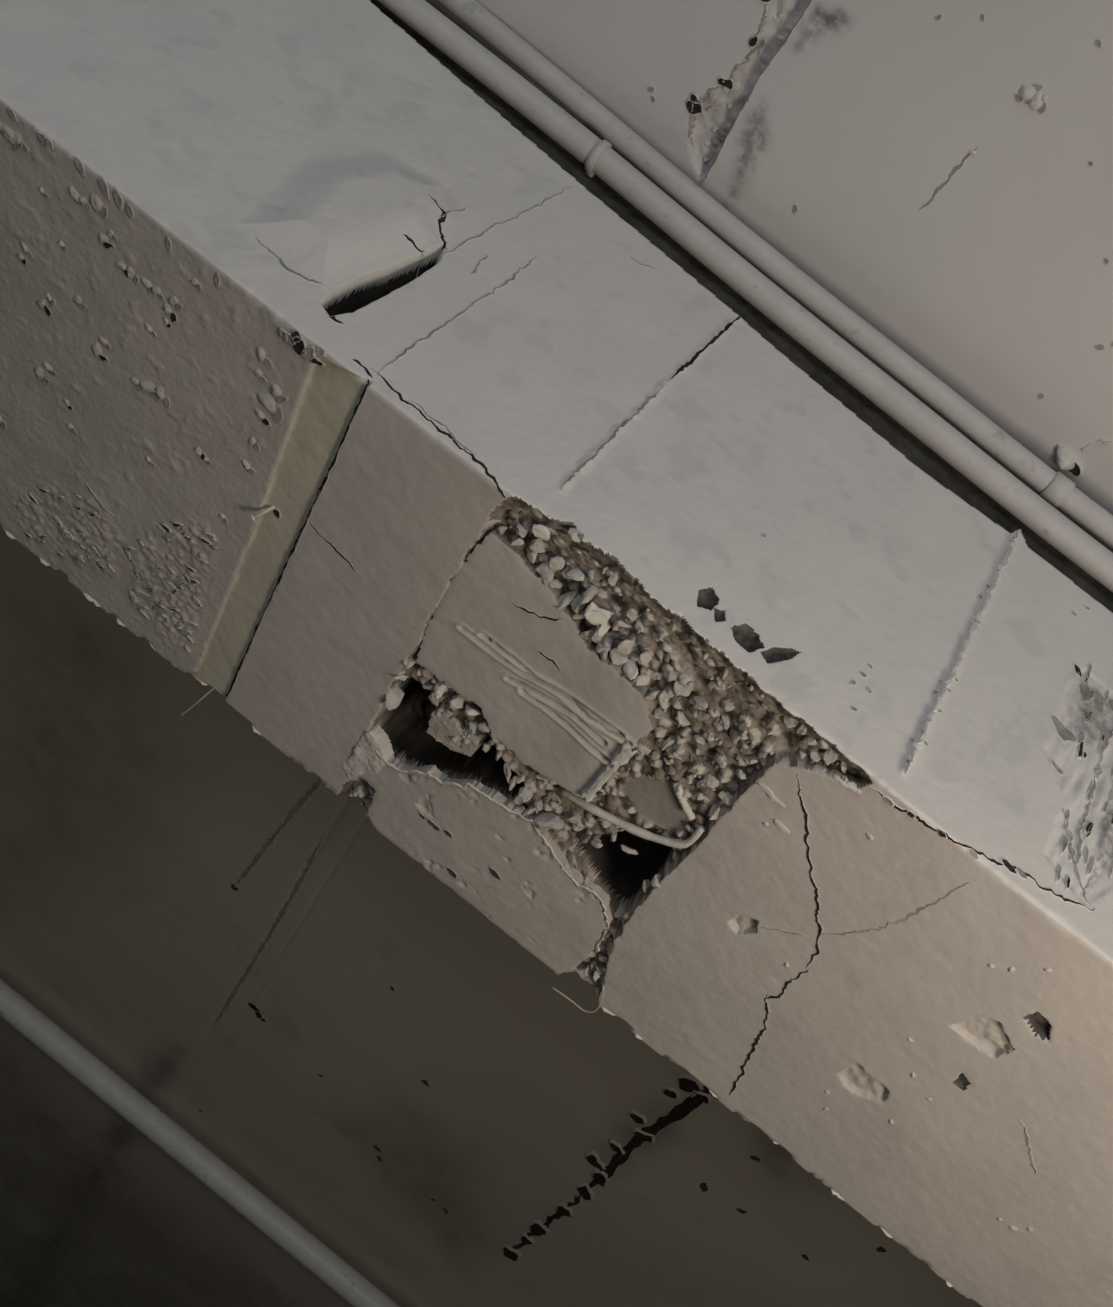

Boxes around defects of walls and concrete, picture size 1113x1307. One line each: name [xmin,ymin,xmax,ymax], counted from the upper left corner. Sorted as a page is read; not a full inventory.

peeling [685,91,715,116]
crack [403,186,573,278]
crack [254,235,343,324]
spalling [324,258,438,316]
crack [561,316,741,489]
crack [225,256,537,700]
spalling [337,776,376,809]
spalling [370,496,872,1016]
crack [730,775,1095,1094]
spalling [951,1015,1015,1059]
spalling [1023,1012,1052,1041]
spalling [952,1073,971,1091]